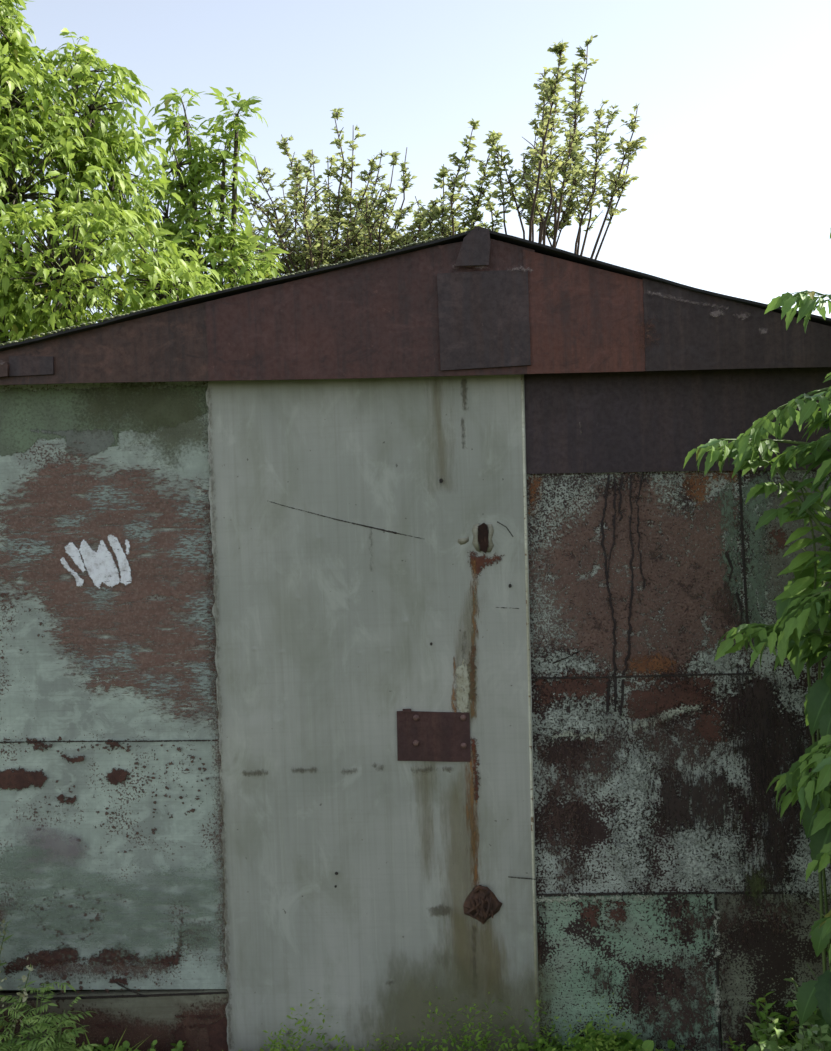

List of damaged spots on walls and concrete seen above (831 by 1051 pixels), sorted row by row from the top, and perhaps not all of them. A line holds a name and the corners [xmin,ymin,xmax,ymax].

peeling [0,385,218,725]
rust [467,551,504,718]
water stain [601,473,646,716]
rust [531,652,745,933]
rust [0,998,229,1051]
rust [536,897,552,1047]
rust [582,889,801,1051]